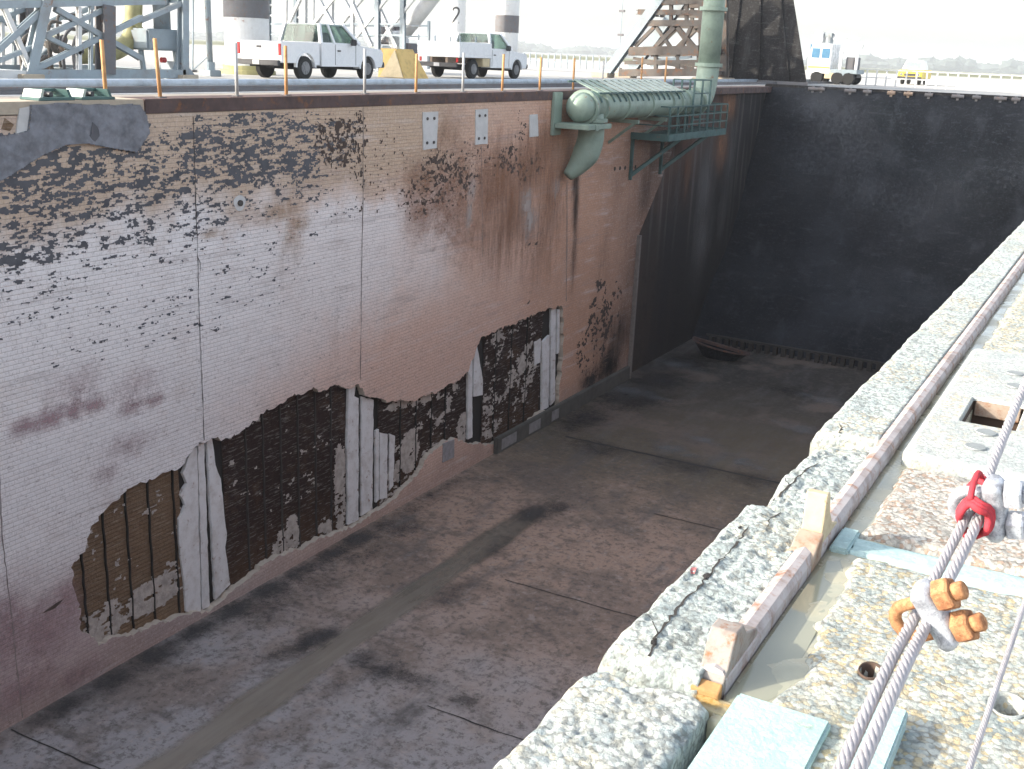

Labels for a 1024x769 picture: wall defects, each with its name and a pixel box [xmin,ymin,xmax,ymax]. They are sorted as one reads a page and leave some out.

peeling [0,110,543,326]
spalling [71,279,622,646]
crack [505,436,818,657]